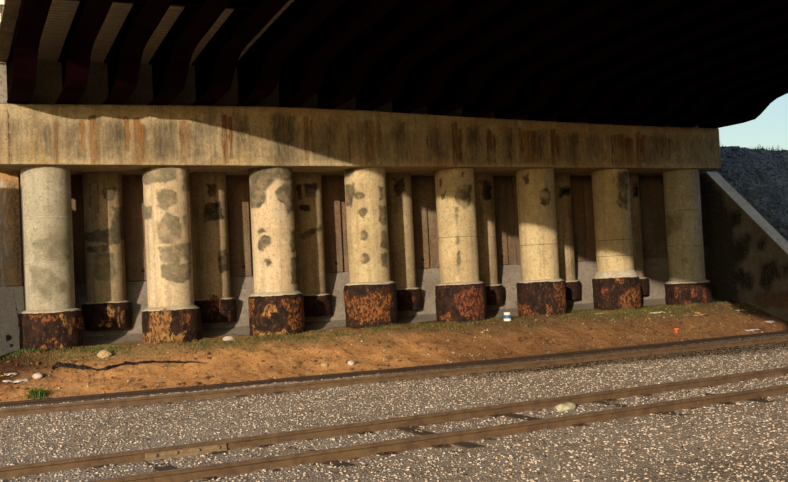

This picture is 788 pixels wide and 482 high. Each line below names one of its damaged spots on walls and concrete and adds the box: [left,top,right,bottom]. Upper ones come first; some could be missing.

corrosion [222,114,233,160]
damp [677,178,788,303]